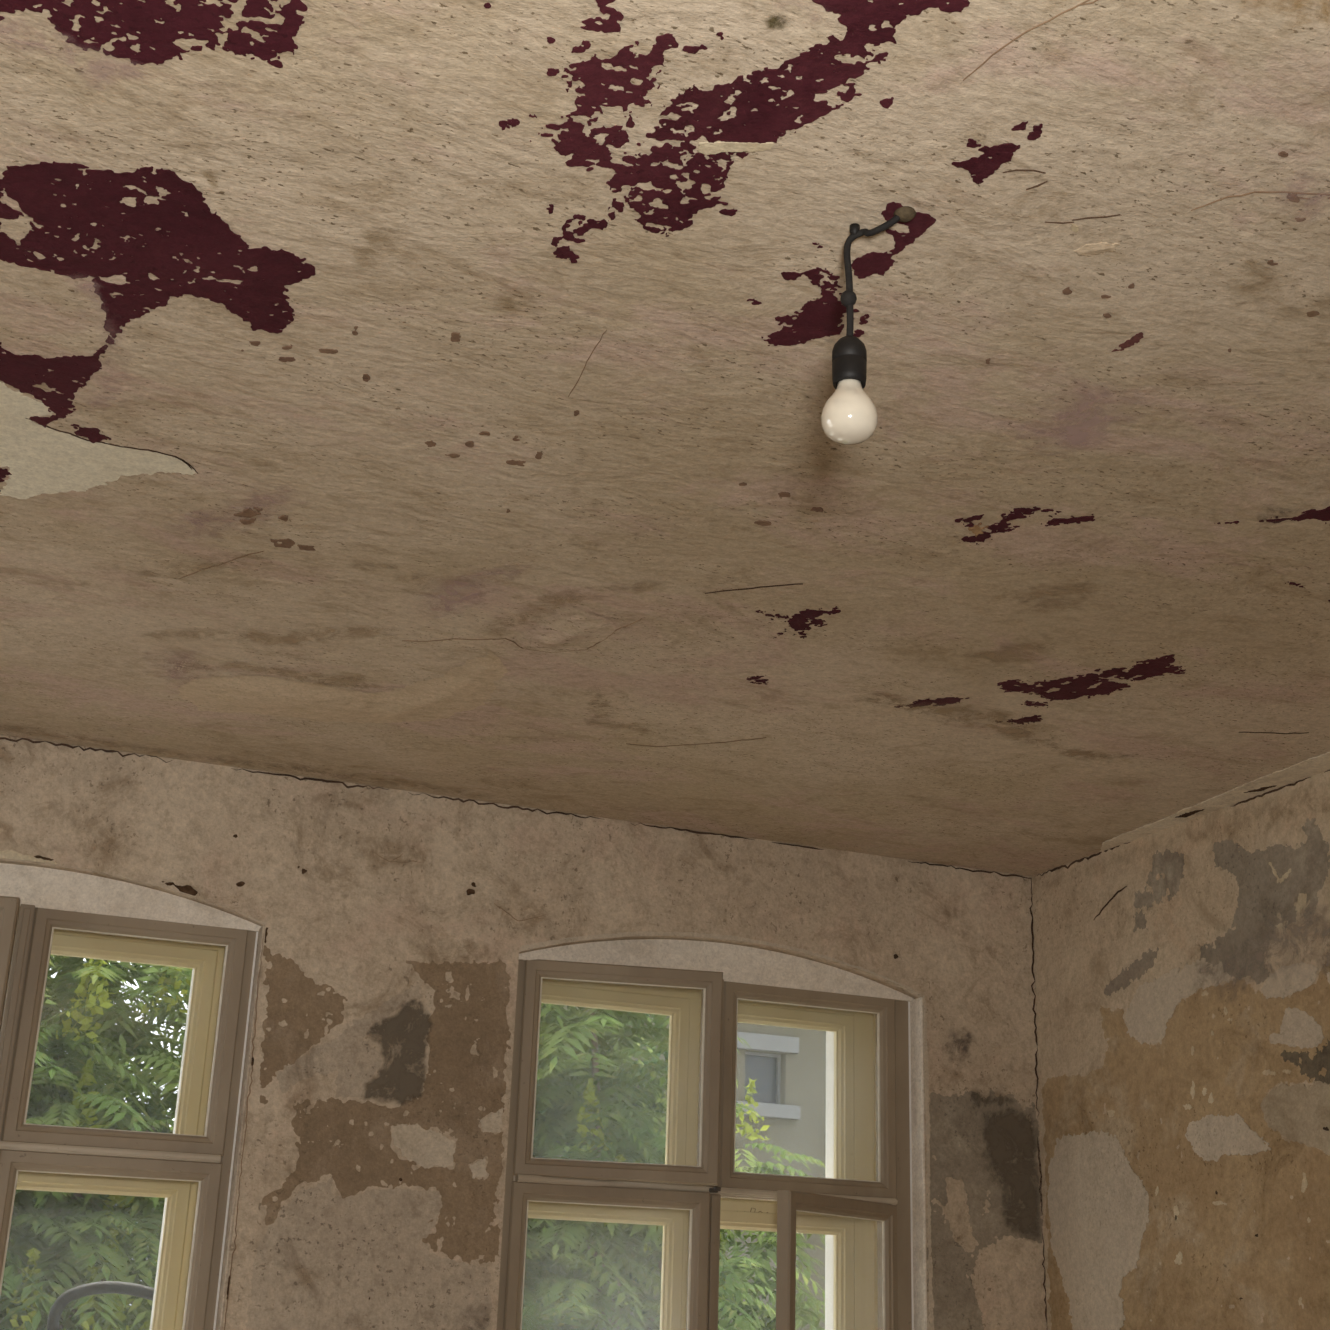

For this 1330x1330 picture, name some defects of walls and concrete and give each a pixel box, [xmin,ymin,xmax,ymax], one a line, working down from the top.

peeling [0,0,308,68]
peeling [499,0,970,263]
peeling [952,121,1043,184]
crack [1191,191,1330,211]
peeling [0,161,316,499]
peeling [761,202,936,346]
peeling [955,506,1095,545]
peeling [996,654,1186,725]
peeling [251,928,348,1104]
peeling [261,959,511,1265]
water stain [972,1092,1038,1235]
peeling [927,818,1330,1330]